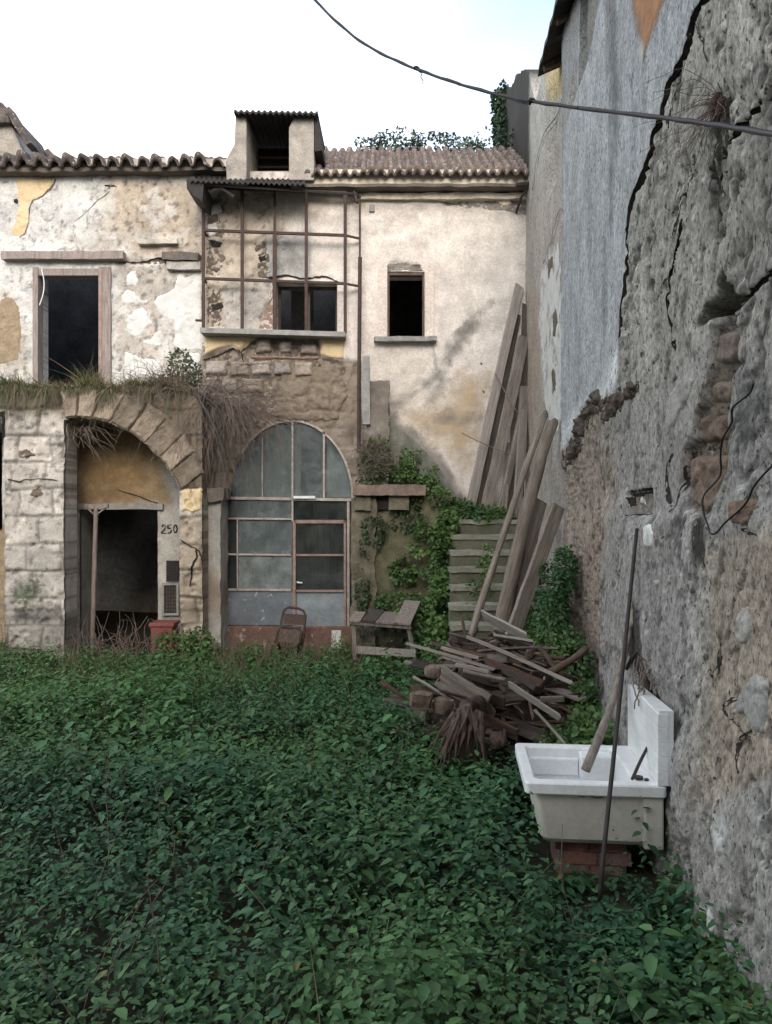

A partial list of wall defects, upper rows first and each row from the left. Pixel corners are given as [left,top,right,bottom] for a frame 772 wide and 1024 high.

peeling [0,297,22,364]
peeling [12,178,56,238]
spalling [120,198,348,425]
crack [265,274,338,282]
peeling [538,242,639,466]
crack [618,0,710,345]
spalling [666,313,743,512]
crack [181,540,202,586]